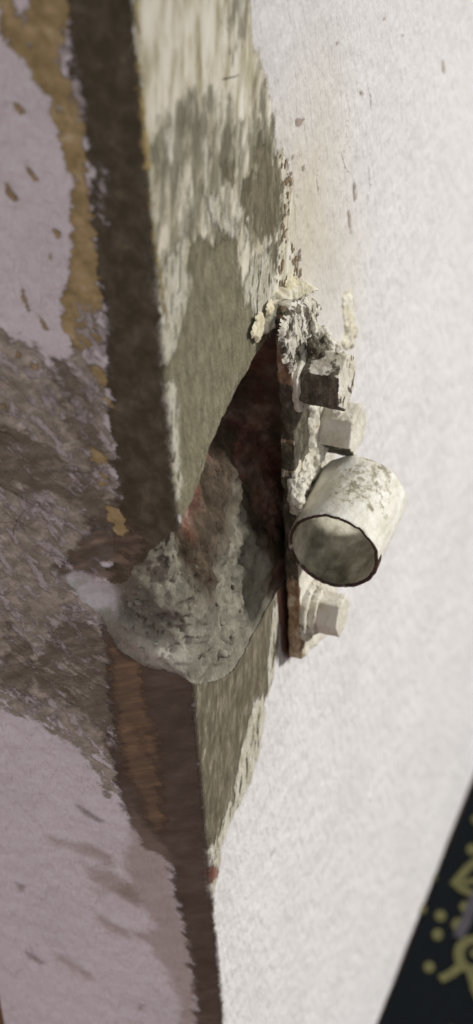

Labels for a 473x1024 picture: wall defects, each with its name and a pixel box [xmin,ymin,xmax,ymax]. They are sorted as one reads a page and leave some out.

peeling [5,182,18,202]
spalling [62,0,318,1024]
rust [276,581,291,660]
rust [206,866,219,883]